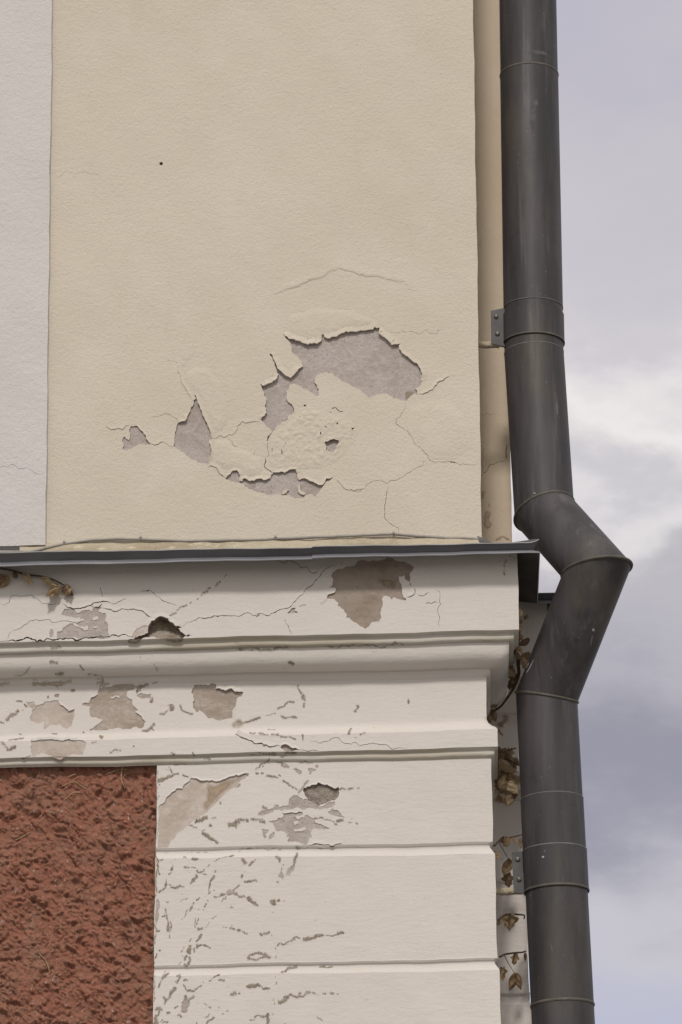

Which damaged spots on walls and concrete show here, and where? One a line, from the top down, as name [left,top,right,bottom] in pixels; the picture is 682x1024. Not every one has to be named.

peeling [173,392,215,464]
peeling [225,320,426,498]
crack [336,372,507,531]
spalling [128,612,189,643]
crack [2,557,350,642]
peeling [320,557,414,629]
crack [407,587,441,625]
peeling [26,680,151,760]
peeling [192,682,243,721]
crack [236,730,408,751]
peeling [158,771,248,848]
peeling [258,768,345,845]